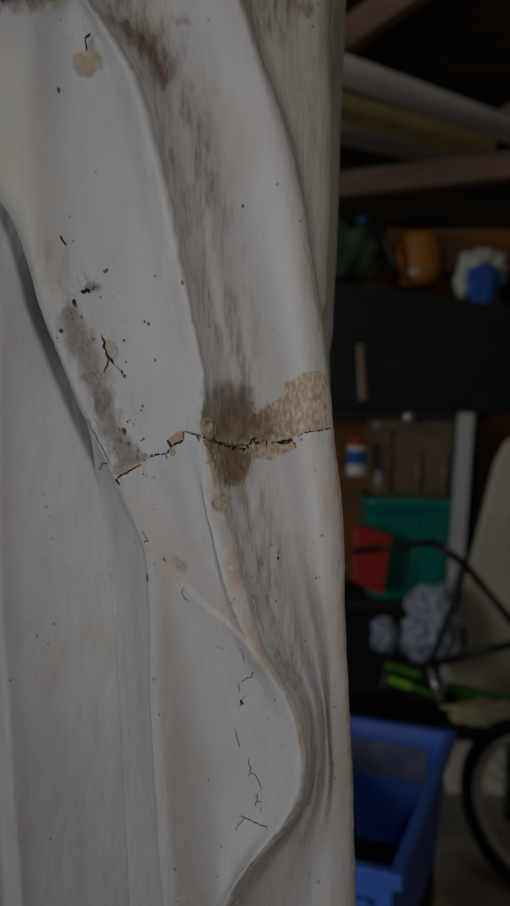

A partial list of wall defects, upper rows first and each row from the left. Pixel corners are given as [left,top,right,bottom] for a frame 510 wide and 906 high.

crack [82,412,331,485]
peeling [200,371,329,511]
crack [217,646,254,706]
crack [235,729,268,832]